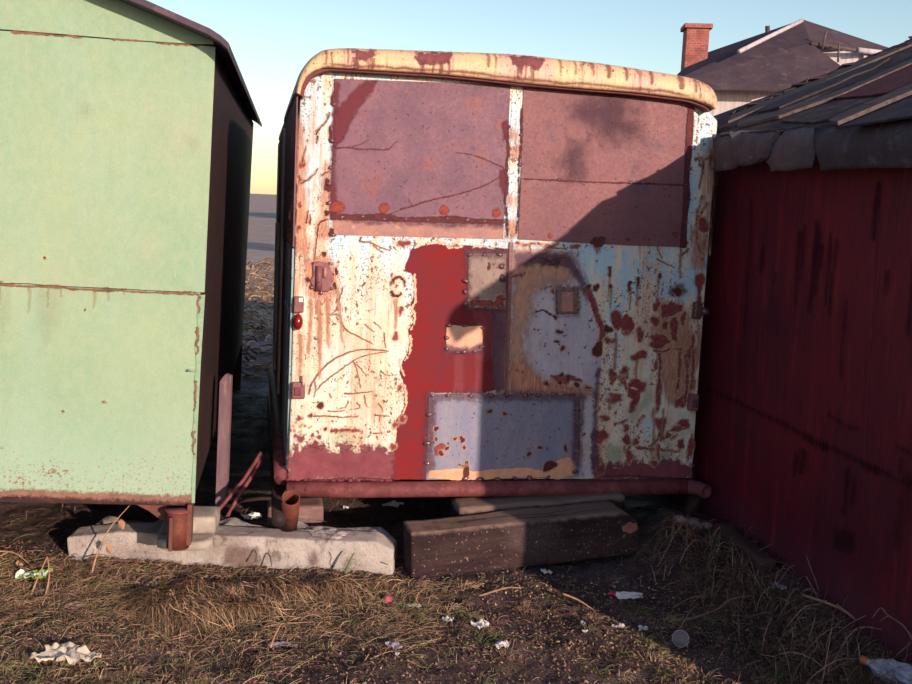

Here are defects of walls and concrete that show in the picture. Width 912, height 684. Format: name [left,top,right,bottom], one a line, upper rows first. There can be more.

rust [11,30,82,38]
rust [111,38,201,47]
rust [0,281,201,313]
rust [0,456,192,503]